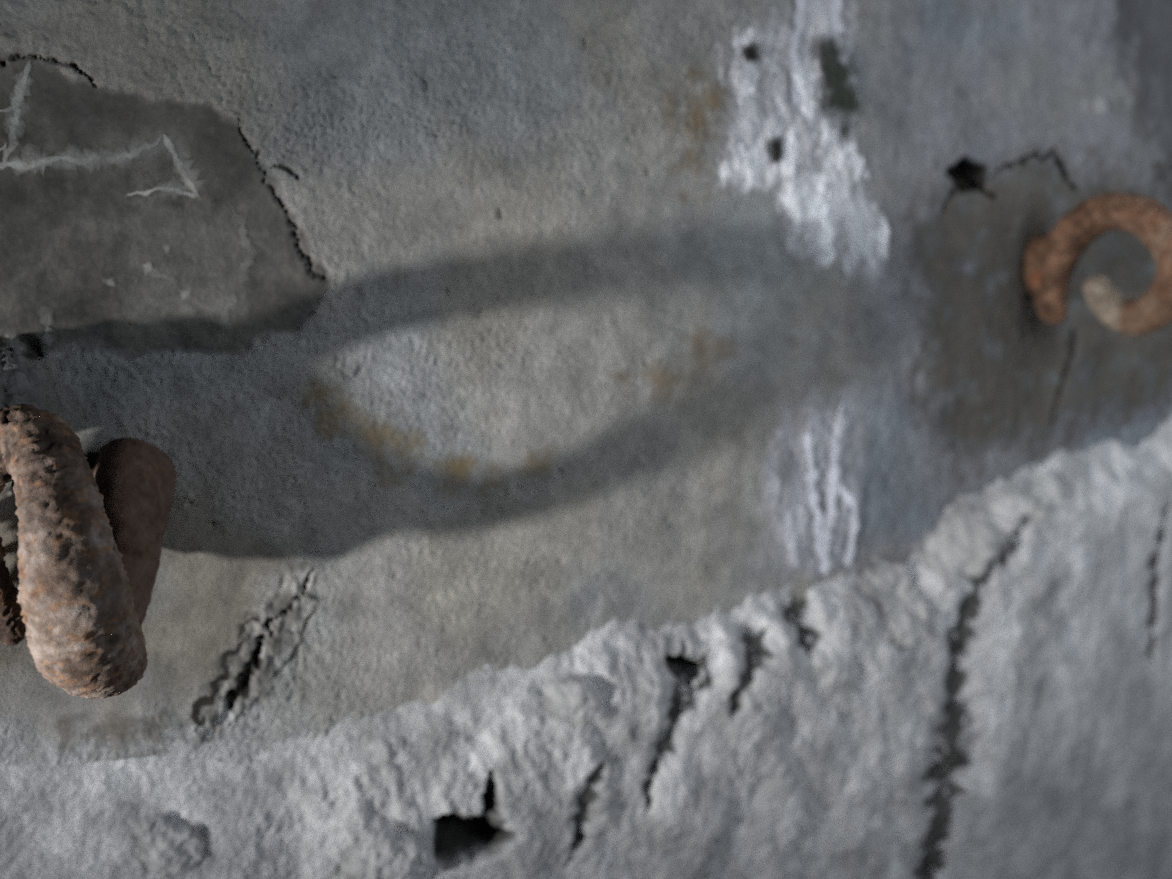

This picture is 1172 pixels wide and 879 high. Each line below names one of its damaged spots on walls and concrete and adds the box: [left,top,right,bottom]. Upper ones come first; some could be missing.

spalling [0,56,327,355]
crack [191,566,320,741]